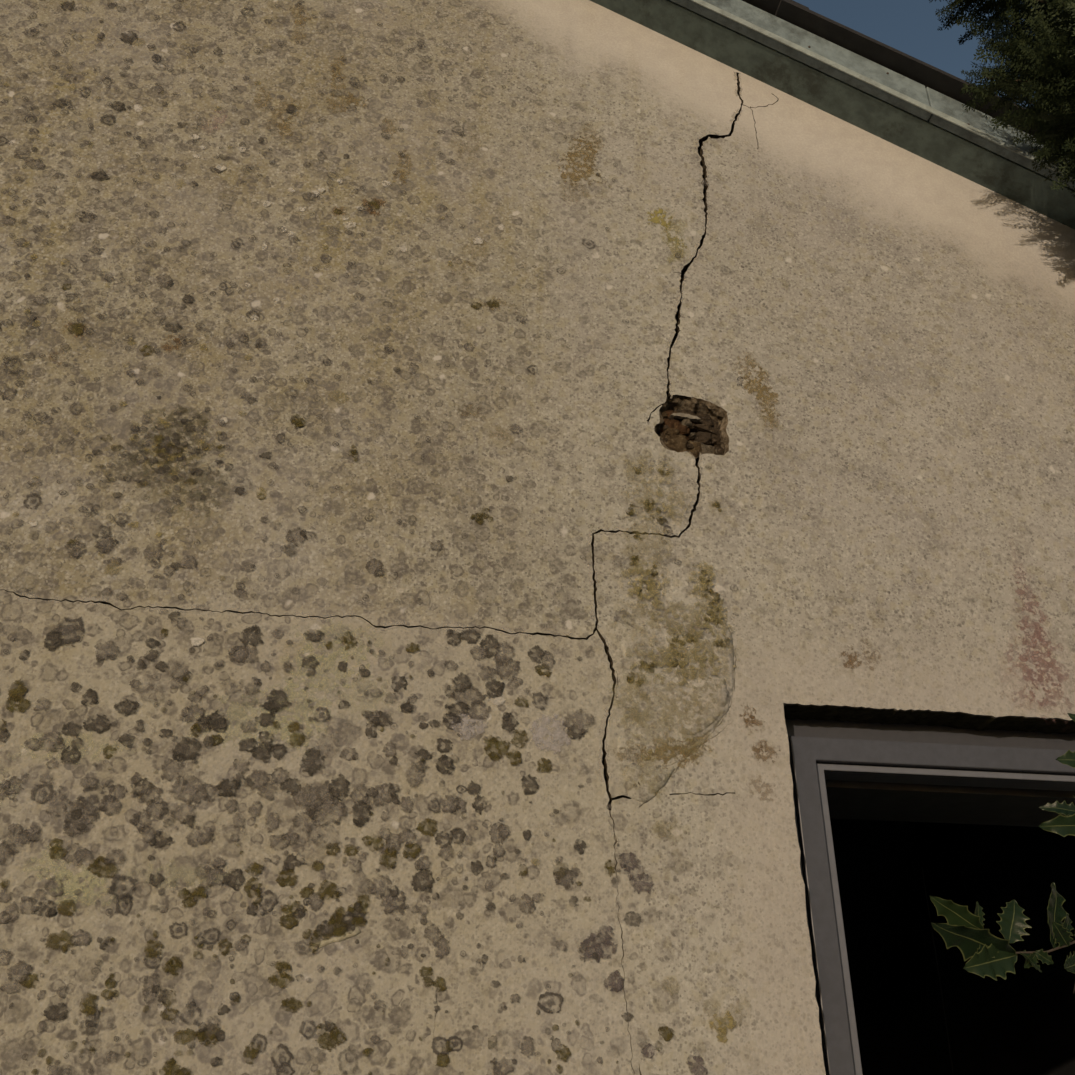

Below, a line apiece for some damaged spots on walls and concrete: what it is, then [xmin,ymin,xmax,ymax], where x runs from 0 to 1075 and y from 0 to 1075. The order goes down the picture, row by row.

crack [647,72,779,422]
spalling [654,395,729,458]
leakage [49,867,104,900]
crack [5,454,736,1075]